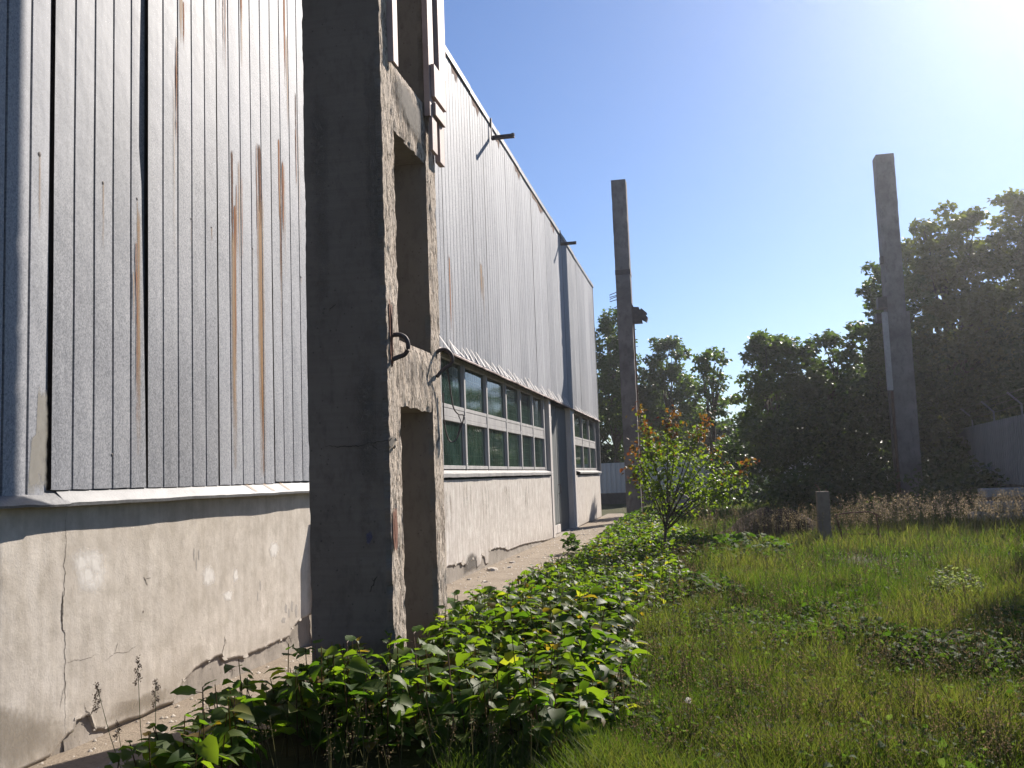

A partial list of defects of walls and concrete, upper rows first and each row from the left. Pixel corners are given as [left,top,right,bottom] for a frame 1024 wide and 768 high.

rust [176,0,184,135]
rust [283,0,297,146]
rust [278,139,300,238]
rust [231,152,243,412]
rust [256,145,264,468]
crack [60,521,136,721]
spalling [173,602,312,704]
spalling [446,541,541,584]
spalling [63,714,107,752]